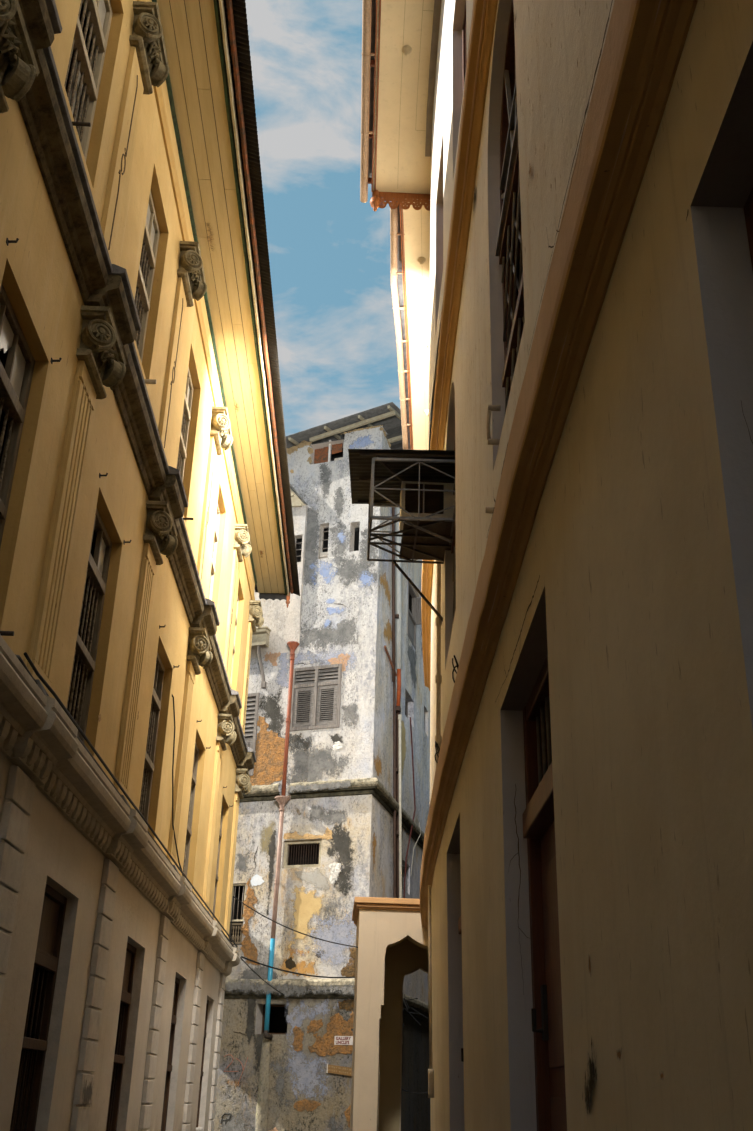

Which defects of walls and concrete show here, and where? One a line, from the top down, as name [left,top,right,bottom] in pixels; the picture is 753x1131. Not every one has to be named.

water stain [304,464,381,588]
water stain [300,619,358,649]
flaking render [250,716,285,786]
peeling [280,886,357,977]
water stain [296,805,354,926]
crack [508,784,528,992]
flaking render [285,998,354,1112]